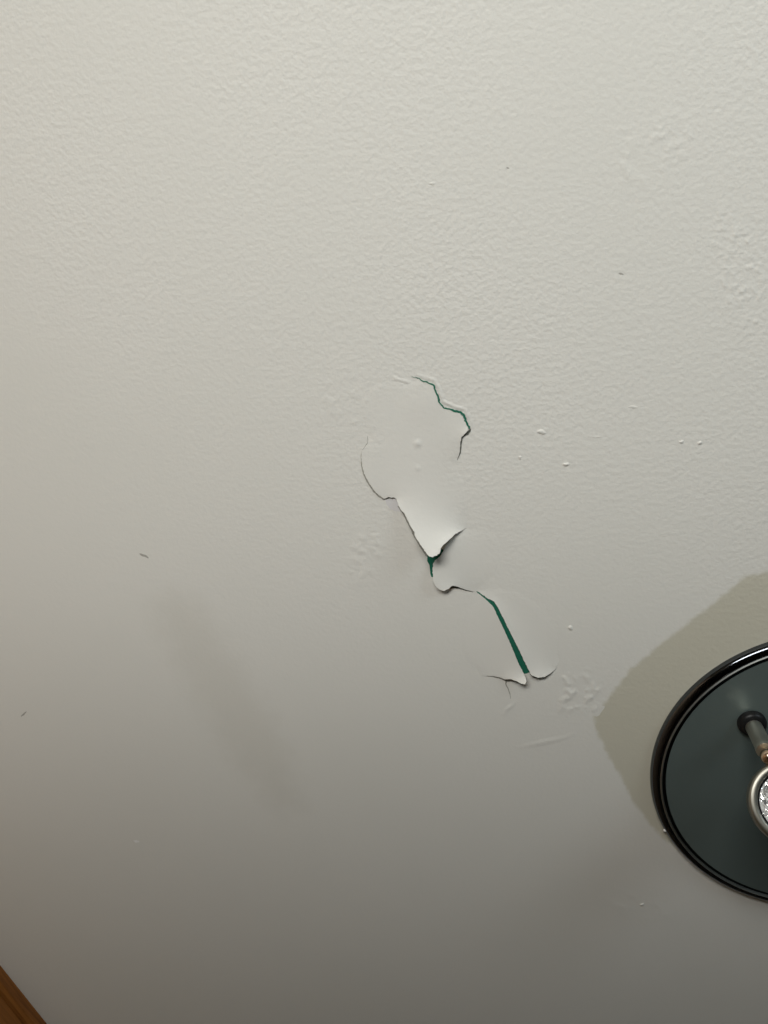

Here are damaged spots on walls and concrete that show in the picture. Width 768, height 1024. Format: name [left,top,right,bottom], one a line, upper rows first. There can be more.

crack [412,372,476,460]
peeling [359,378,560,699]
leakage [585,562,768,868]